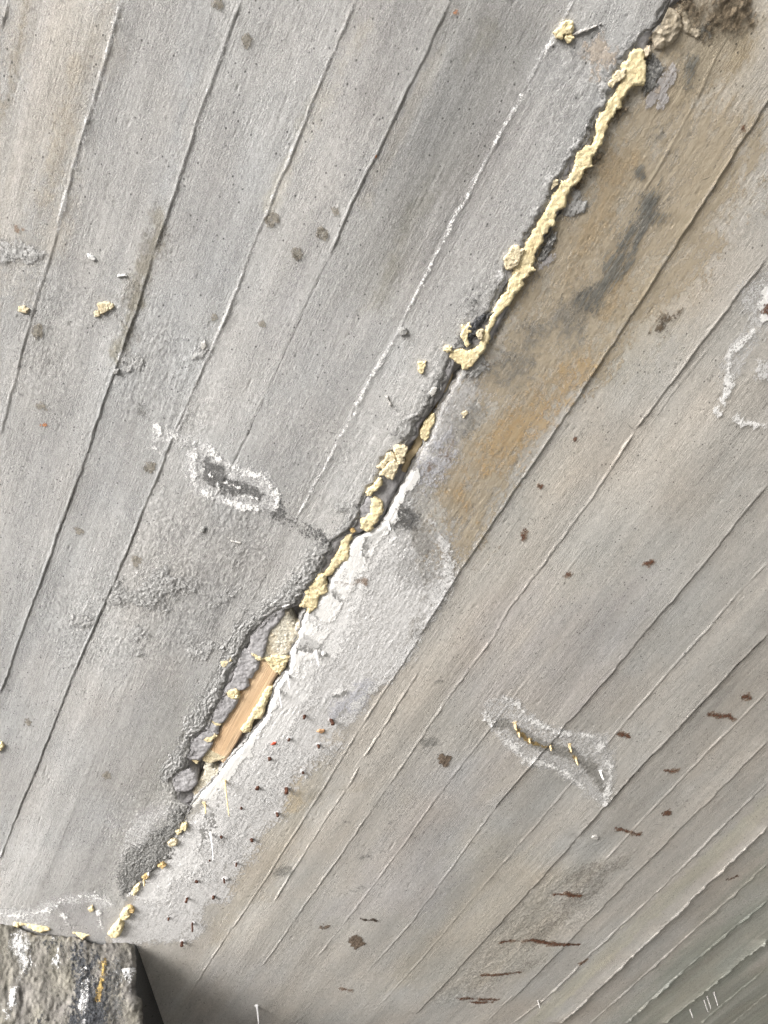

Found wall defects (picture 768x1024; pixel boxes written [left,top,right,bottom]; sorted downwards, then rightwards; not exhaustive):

crack [527,0,671,238]
crack [284,269,513,619]
damp [112,0,768,949]
crack [176,645,256,837]
spalling [159,501,363,782]
rust [703,711,737,721]
rust [499,938,580,947]